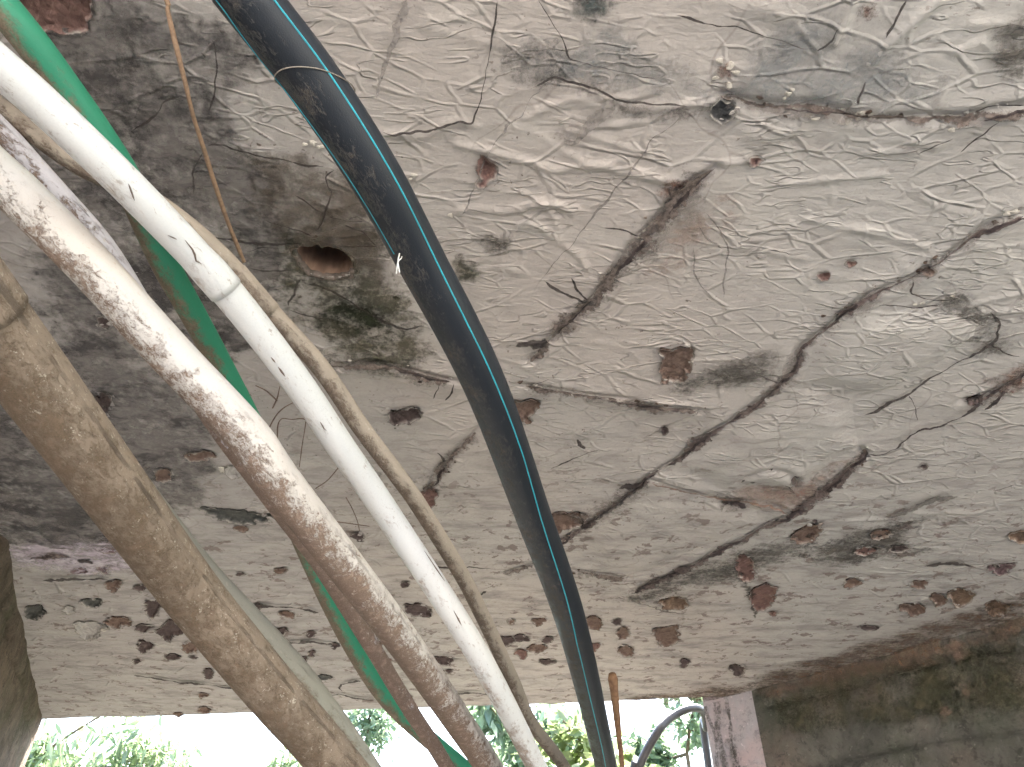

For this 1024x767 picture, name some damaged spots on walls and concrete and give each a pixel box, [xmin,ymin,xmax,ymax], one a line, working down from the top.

spalling [20,0,93,35]
crack [464,0,1024,615]
water stain [35,254,216,509]
spalling [658,344,695,385]
water stain [0,407,132,575]
spalling [24,604,47,621]
spalling [62,546,214,679]
spalling [501,618,557,666]
spalling [586,615,634,657]
spalling [652,624,681,648]
spalling [899,580,1011,618]
water stain [758,620,1024,732]